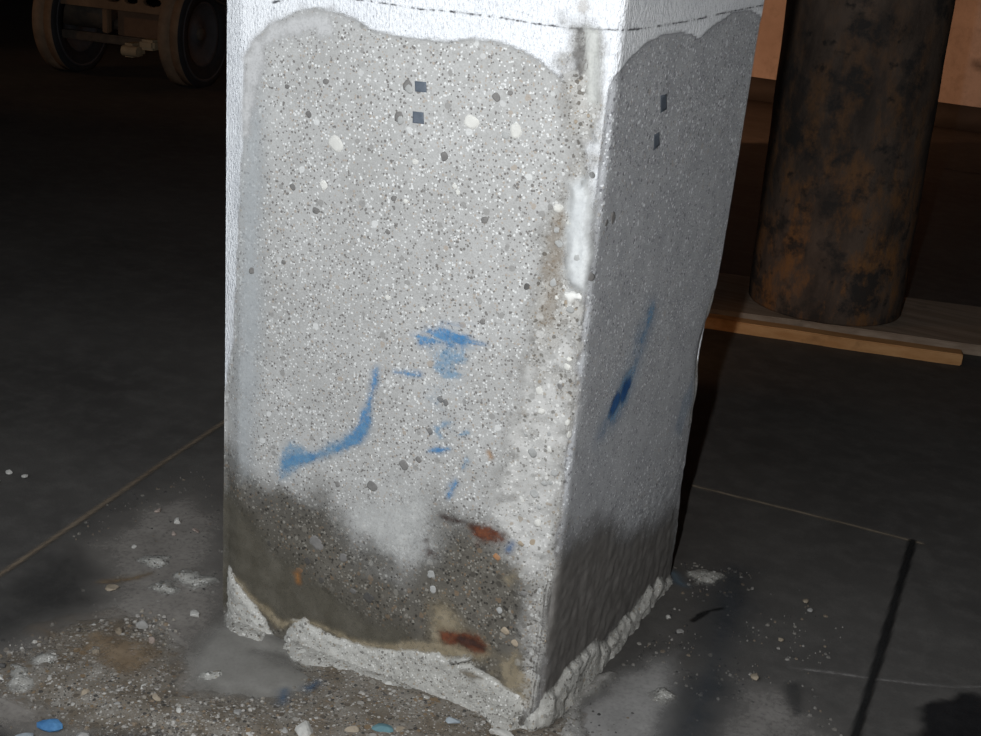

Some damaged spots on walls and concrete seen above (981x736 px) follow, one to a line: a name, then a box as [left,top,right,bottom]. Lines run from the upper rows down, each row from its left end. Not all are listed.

peeling [223,8,761,736]
water stain [223,460,677,726]
rust [432,605,489,659]
rust [442,516,503,541]